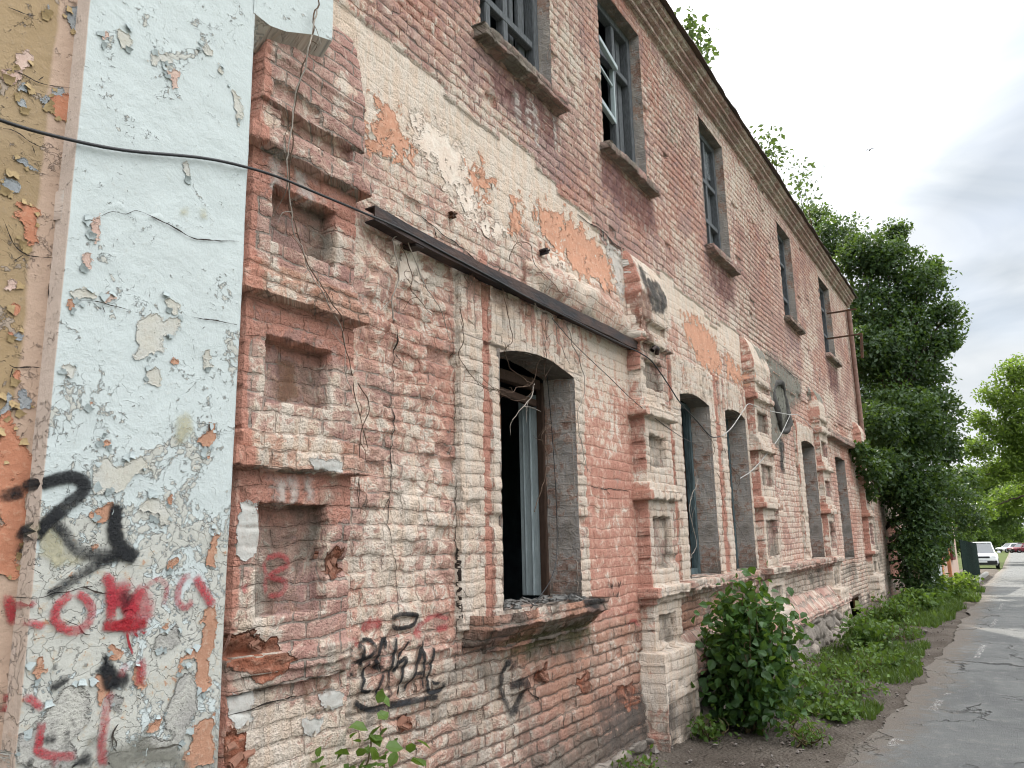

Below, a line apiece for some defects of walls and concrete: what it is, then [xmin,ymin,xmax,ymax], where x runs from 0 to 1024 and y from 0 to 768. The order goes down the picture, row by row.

peeling [1,49,69,123]
peeling [0,155,42,254]
peeling [66,213,117,315]
crack [102,210,225,241]
peeling [364,89,643,306]
peeling [680,309,756,387]
peeling [89,433,151,527]
peeling [197,422,217,459]
crack [383,322,402,618]
spalling [313,545,345,580]
peeling [0,674,127,768]
spalling [126,605,298,768]